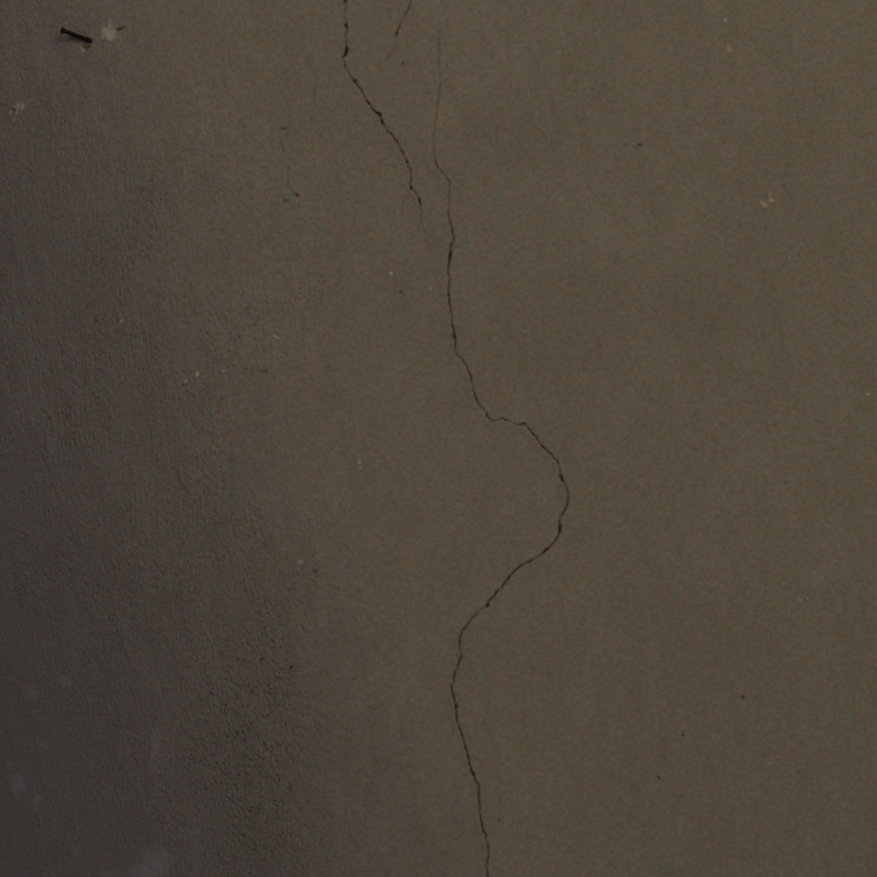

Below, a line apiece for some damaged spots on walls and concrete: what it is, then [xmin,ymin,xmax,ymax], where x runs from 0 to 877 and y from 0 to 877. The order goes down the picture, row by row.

crack [335,0,432,256]